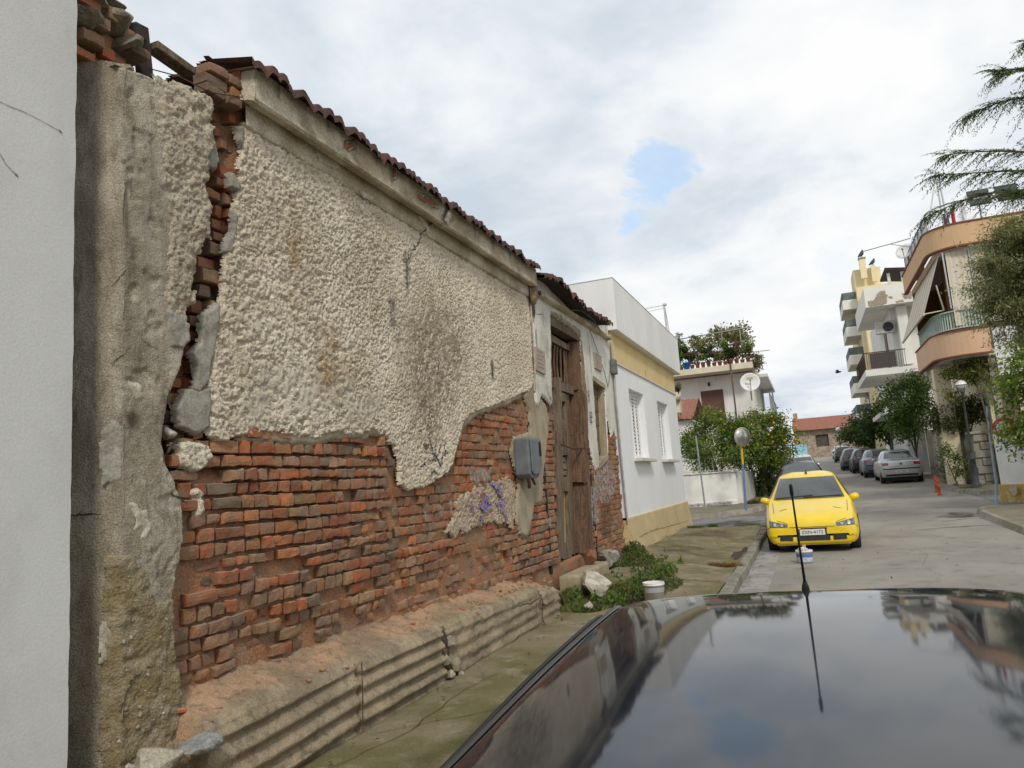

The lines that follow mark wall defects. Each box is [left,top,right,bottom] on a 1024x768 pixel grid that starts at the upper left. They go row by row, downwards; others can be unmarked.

crack [406,201,454,274]
peeling [165,310,190,349]
peeling [868,290,893,307]
spalling [577,337,626,564]
spalling [96,393,561,768]